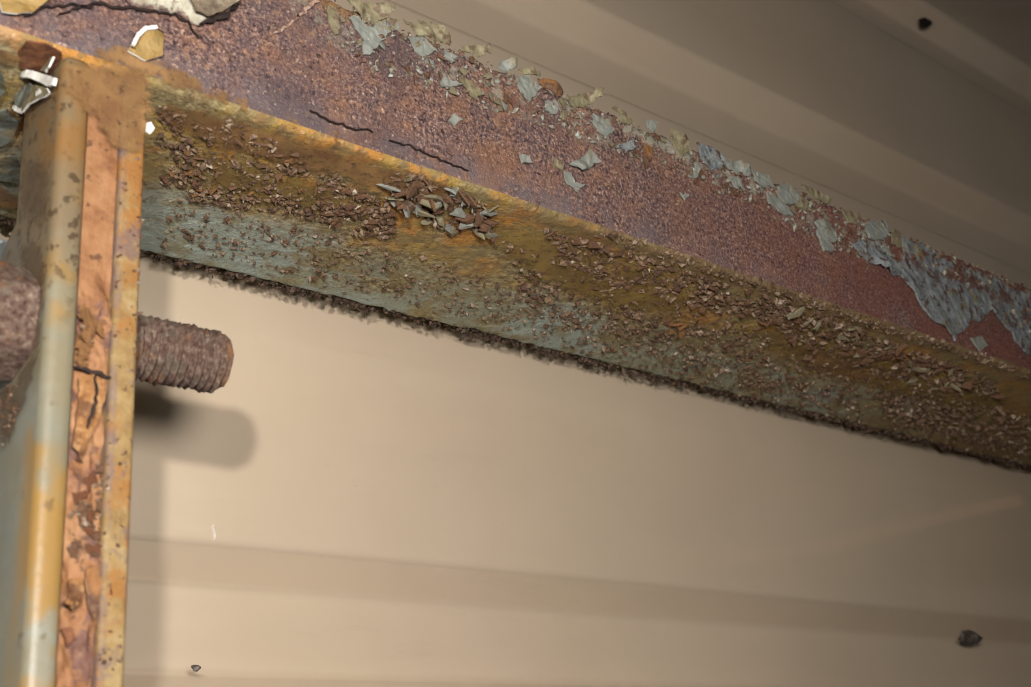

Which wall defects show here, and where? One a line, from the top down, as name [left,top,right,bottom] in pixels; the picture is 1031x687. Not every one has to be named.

peeling [127,25,164,61]
rust [70,46,461,208]
peeling [307,0,1031,356]
rust [479,225,698,317]
rust [0,242,44,446]
peeling [756,303,931,385]
rust [758,324,1007,409]